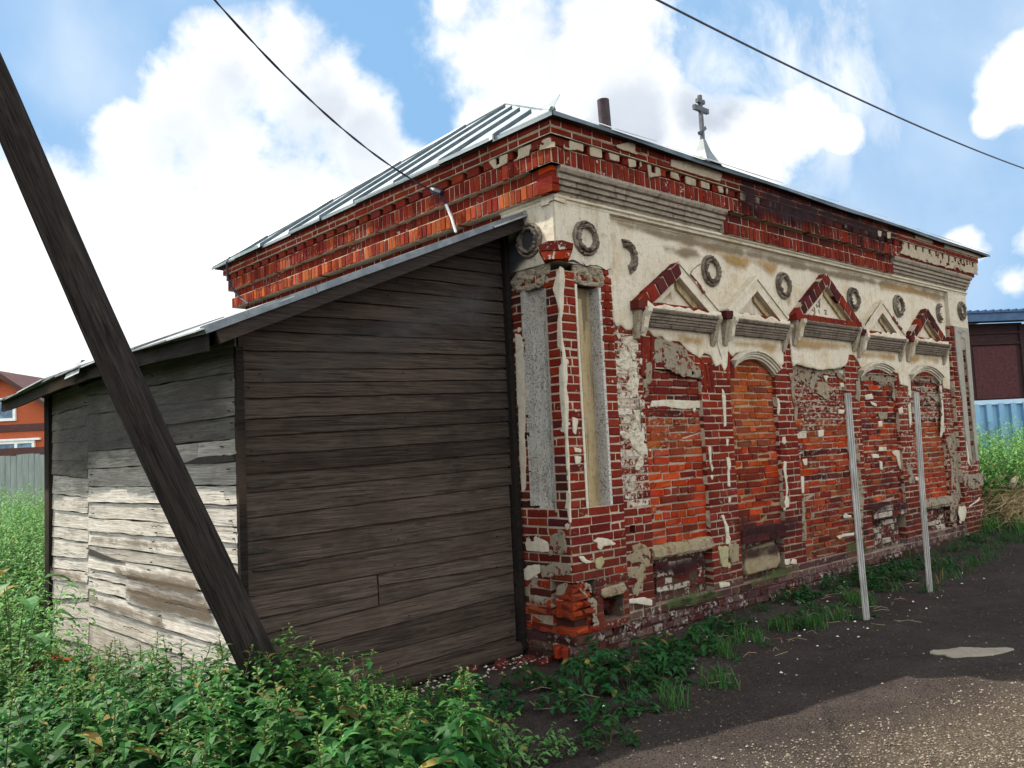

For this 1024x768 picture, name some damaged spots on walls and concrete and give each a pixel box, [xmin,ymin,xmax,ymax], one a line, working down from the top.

water stain [724,255,777,273]
peeling [602,269,701,499]
spalling [777,370,845,444]
peeling [922,476,986,536]
spalling [524,535,616,660]
peeling [629,573,652,606]